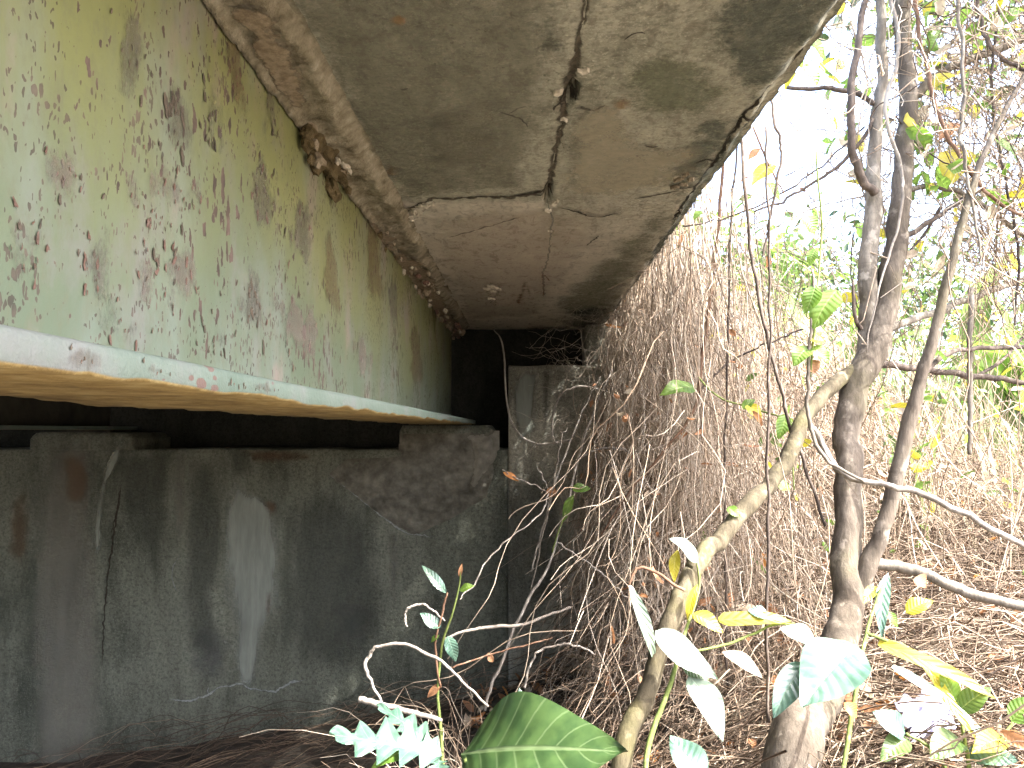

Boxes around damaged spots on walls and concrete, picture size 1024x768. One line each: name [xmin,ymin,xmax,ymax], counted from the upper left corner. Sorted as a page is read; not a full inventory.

peeling [158,90,202,215]
peeling [200,51,244,152]
spalling [231,9,306,144]
peeling [335,157,352,176]
crack [408,0,804,296]
peeling [12,196,49,290]
peeling [78,230,99,296]
peeling [131,191,199,316]
peeling [196,278,271,359]
damp [38,442,123,763]
crack [102,484,122,664]
damp [226,487,277,684]